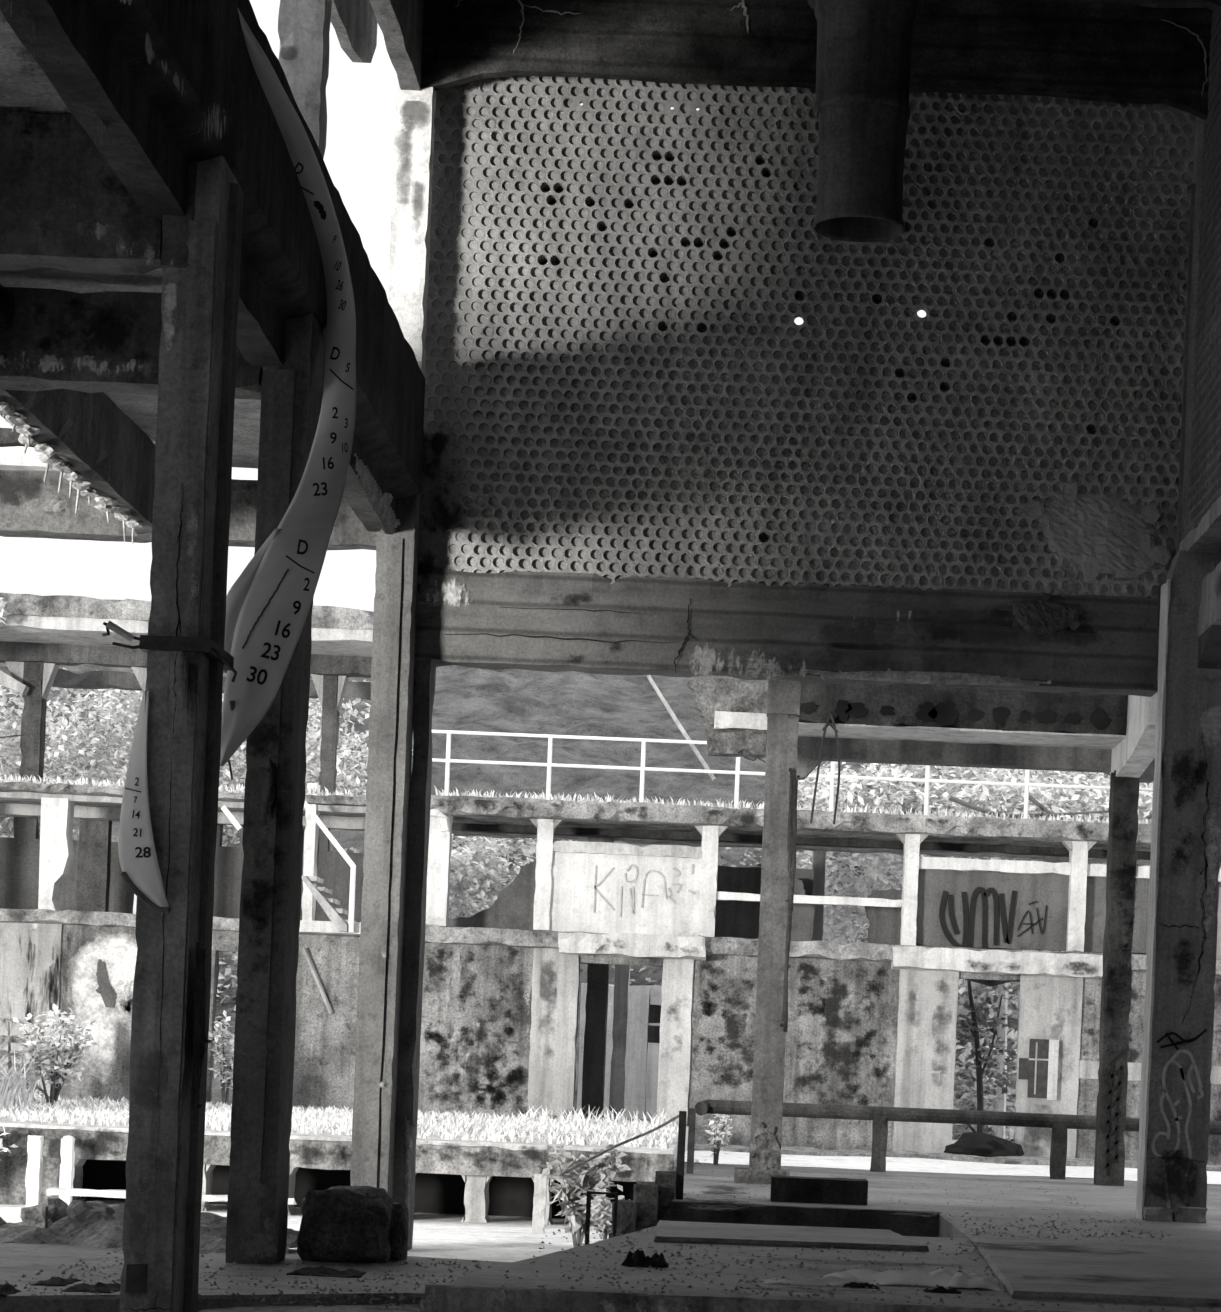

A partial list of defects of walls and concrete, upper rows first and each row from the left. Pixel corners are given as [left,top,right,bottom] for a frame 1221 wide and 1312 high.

crack [513,0,580,54]
crack [1161,19,1208,93]
spalling [0,402,145,544]
crack [445,599,697,670]
damp [1171,750,1207,809]
crack [1158,732,1209,1025]
damp [1174,940,1194,991]
damp [425,947,557,1116]
damp [666,943,754,1086]
damp [794,963,889,1106]
damp [1150,1150,1196,1207]